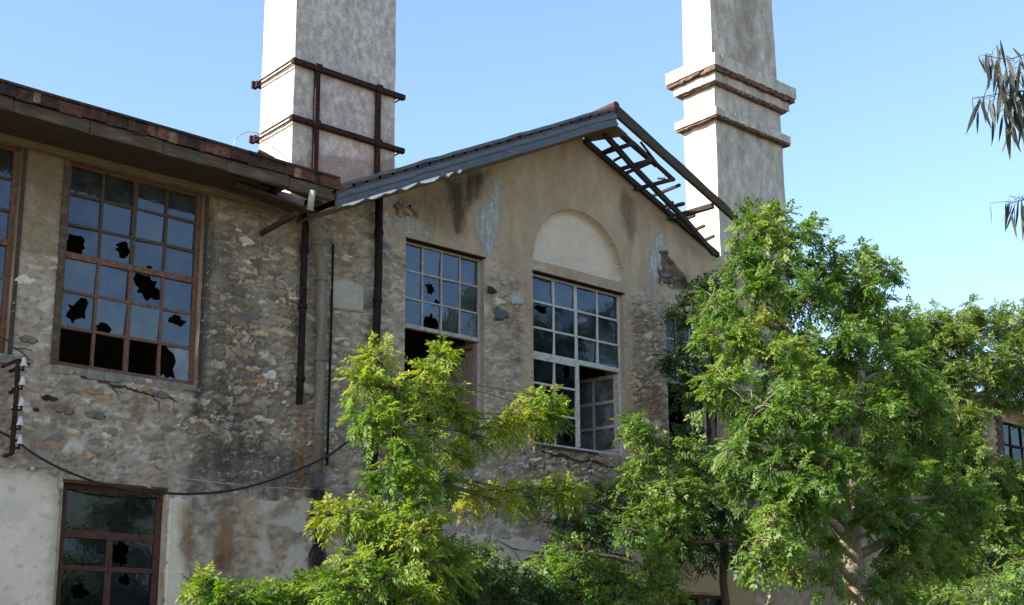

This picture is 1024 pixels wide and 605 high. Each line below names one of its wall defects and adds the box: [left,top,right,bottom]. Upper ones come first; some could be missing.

damp [395,170,500,255]
flaking render [654,250,688,289]
crack [80,376,178,410]